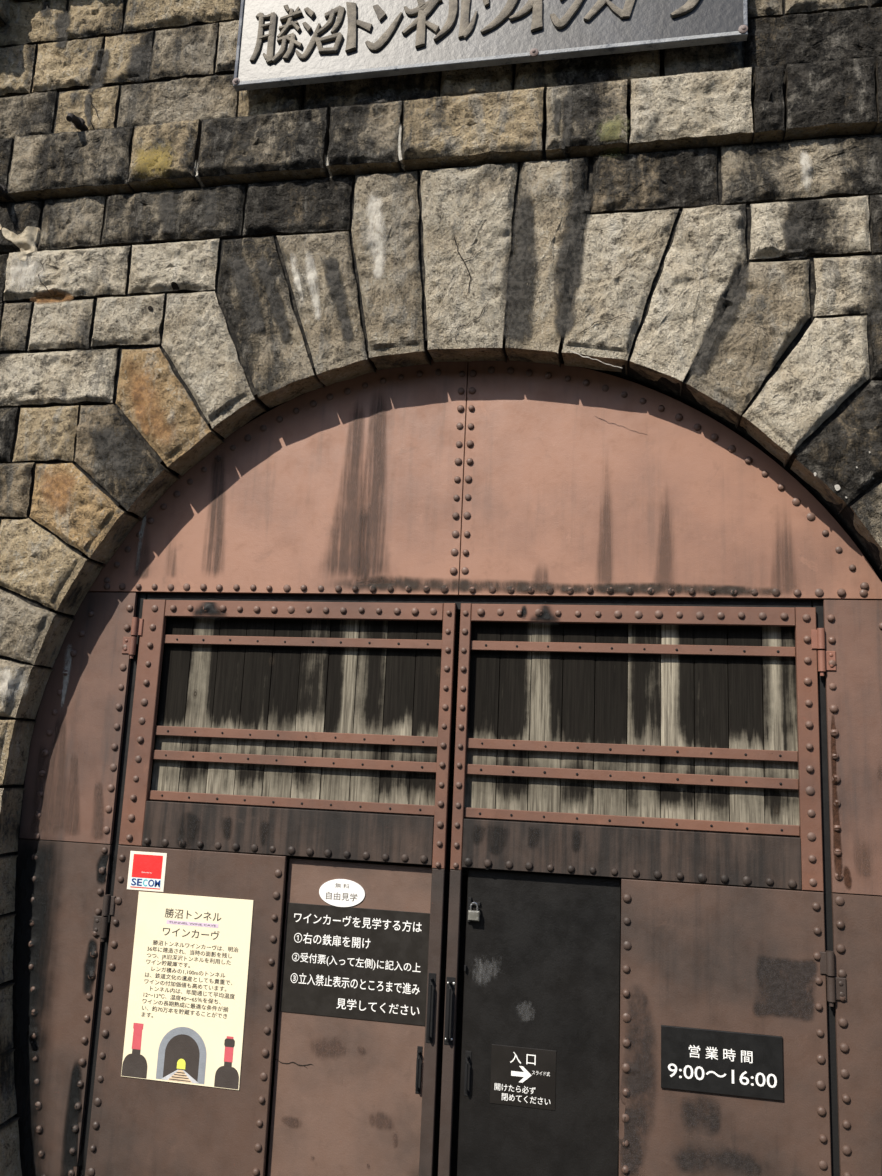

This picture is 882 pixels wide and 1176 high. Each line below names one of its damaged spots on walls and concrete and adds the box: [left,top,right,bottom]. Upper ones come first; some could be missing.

damp [84,49,109,126]
damp [127,45,153,81]
crack [454,237,489,343]
damp [503,195,536,341]
damp [554,188,590,335]
damp [690,263,749,375]
damp [207,457,224,572]
damp [328,399,385,577]